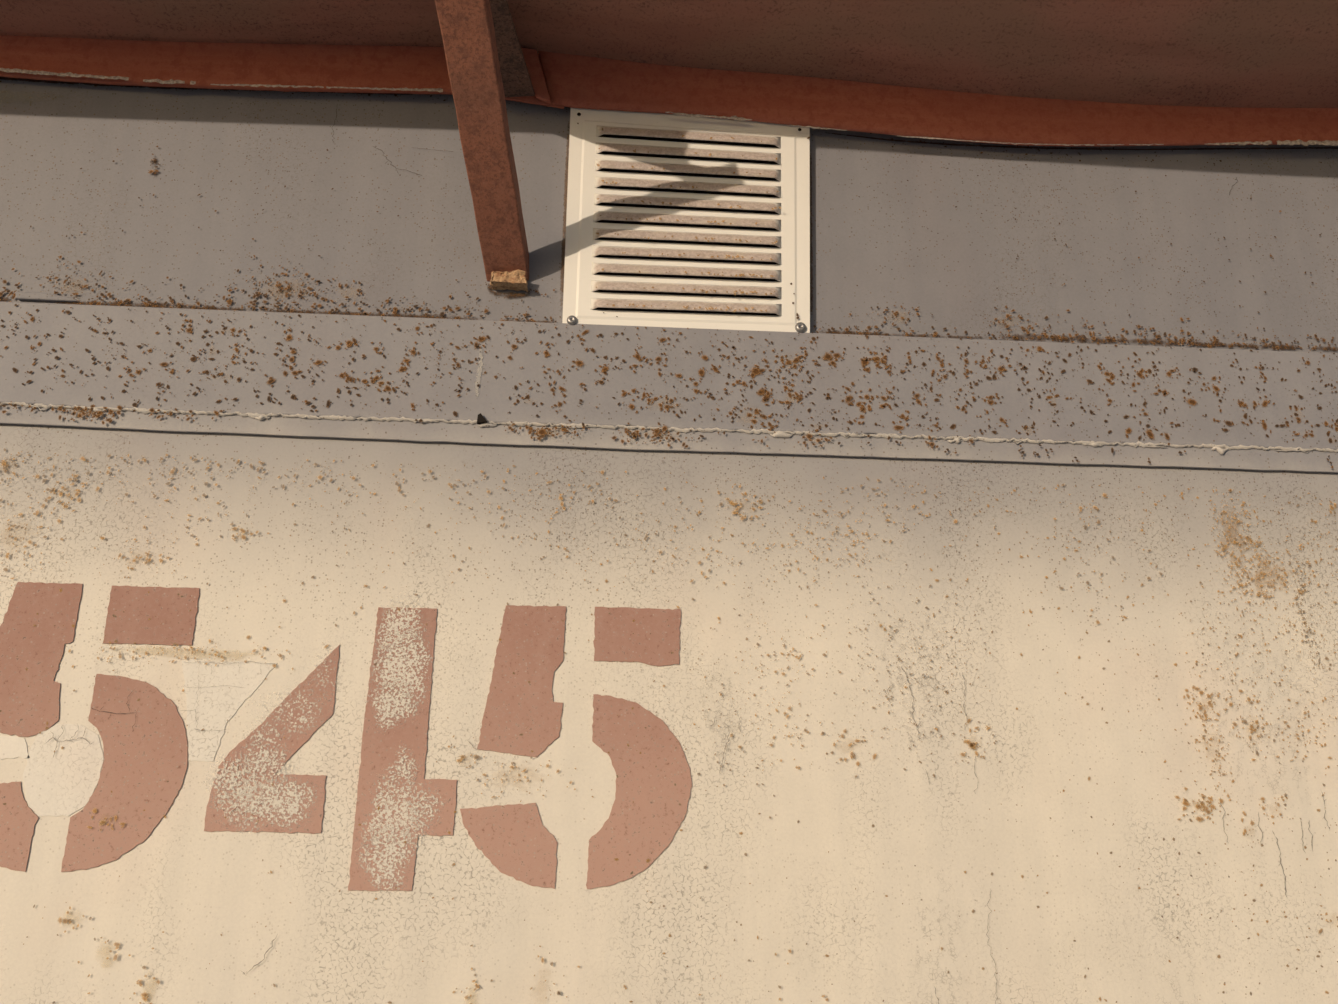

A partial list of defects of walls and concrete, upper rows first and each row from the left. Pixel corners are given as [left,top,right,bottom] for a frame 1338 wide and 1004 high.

rust [0,77,258,92]